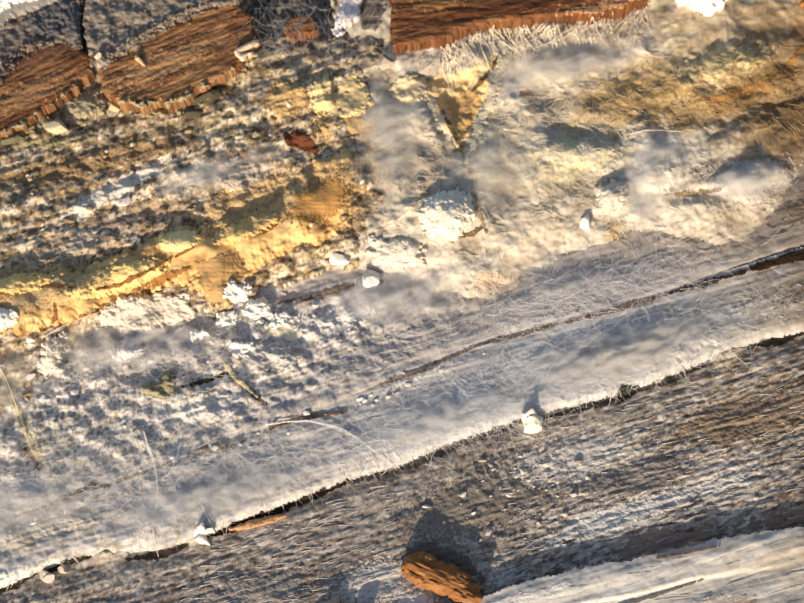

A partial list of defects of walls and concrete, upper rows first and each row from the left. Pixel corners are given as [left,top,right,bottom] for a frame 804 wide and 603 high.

spalling [21,0,81,39]
spalling [214,155,263,191]
crack [278,284,358,305]
crack [378,249,804,386]
crack [177,373,229,389]
water stain [0,129,804,603]
crack [543,360,710,420]
crack [268,410,347,430]
crack [207,419,523,538]
crack [125,544,188,562]
crack [0,555,92,594]
crack [625,578,704,603]